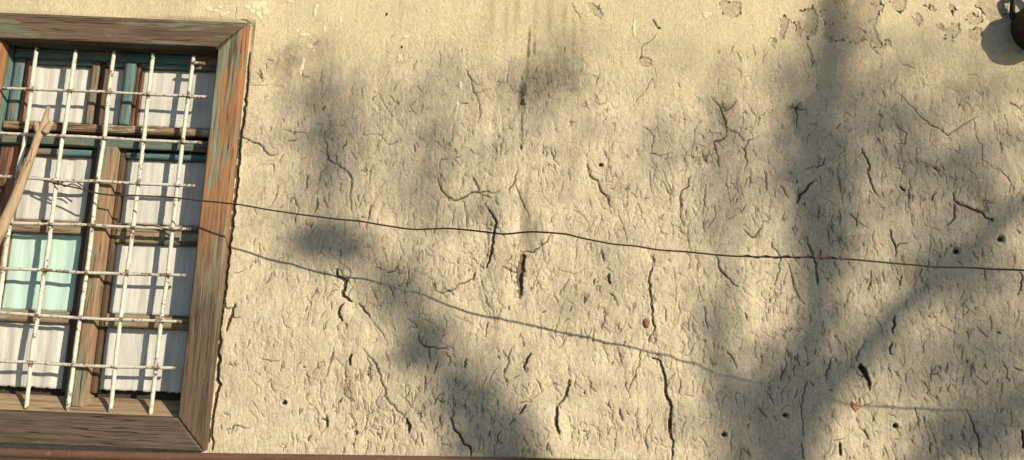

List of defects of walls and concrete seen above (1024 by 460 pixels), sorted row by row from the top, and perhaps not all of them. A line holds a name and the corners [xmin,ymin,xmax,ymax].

crack [209,47,1024,460]